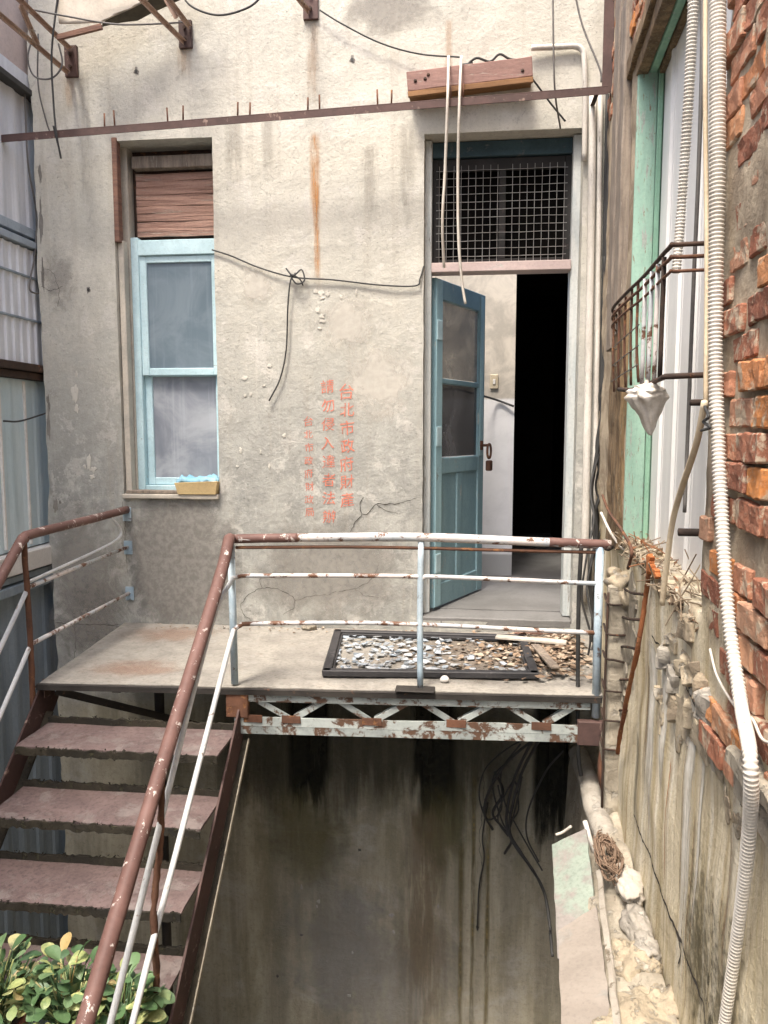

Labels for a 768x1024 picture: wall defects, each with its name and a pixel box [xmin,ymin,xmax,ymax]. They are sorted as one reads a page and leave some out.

crack [350,498,416,532]
water stain [223,694,234,723]
water stain [249,702,505,723]
water stain [536,709,571,725]
water stain [634,644,668,804]
water stain [534,742,570,848]
water stain [224,734,504,1015]
water stain [679,738,705,963]
water stain [722,835,732,949]